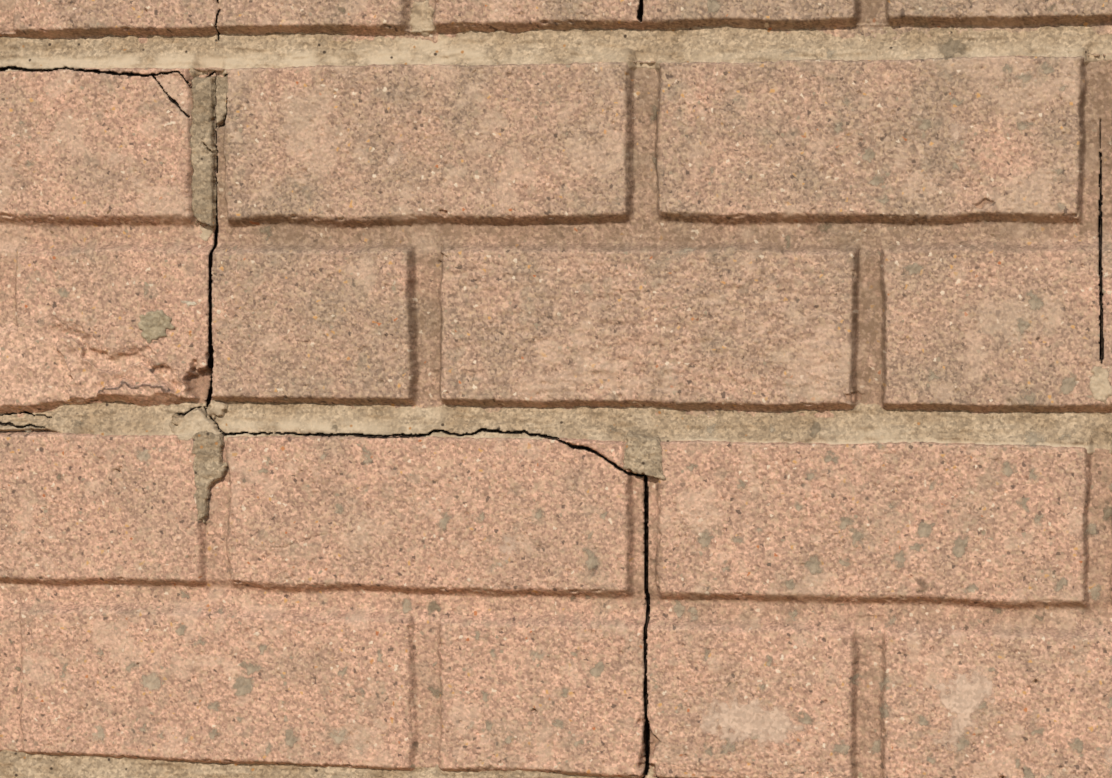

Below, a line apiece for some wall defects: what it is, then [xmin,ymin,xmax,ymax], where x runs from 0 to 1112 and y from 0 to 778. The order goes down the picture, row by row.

crack [213,0,221,40]
crack [636,0,644,21]
crack [1097,130,1105,363]
spalling [0,315,212,416]
crack [0,66,658,778]